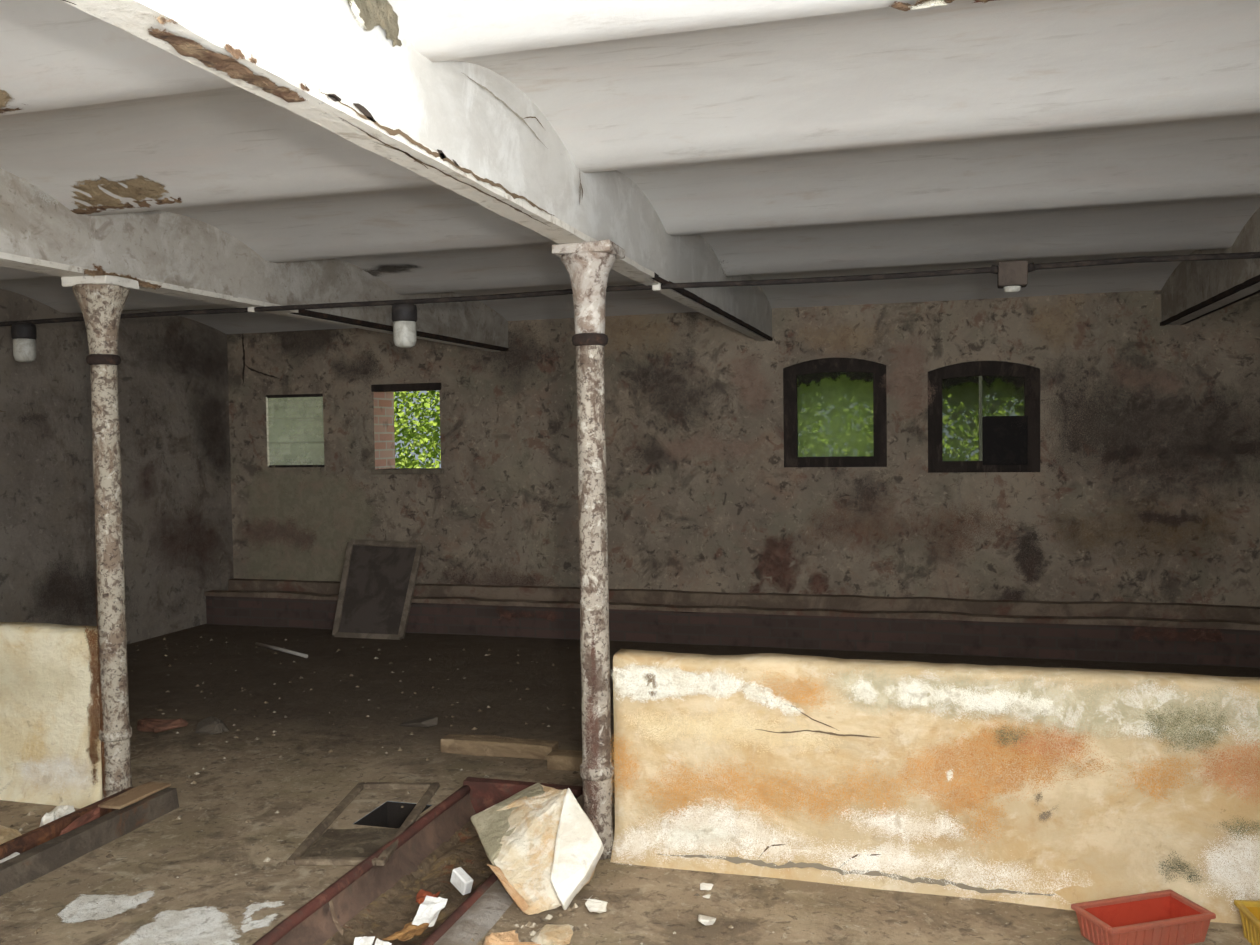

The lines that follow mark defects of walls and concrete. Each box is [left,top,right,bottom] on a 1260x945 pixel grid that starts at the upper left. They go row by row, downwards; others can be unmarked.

spalling [348,0,402,47]
spalling [889,0,955,11]
spalling [142,14,313,103]
spalling [0,90,26,114]
spalling [71,175,182,214]
damp [753,670,838,715]
crack [743,691,879,738]
damp [0,747,96,801]
damp [608,717,1260,916]
crack [658,844,1055,896]